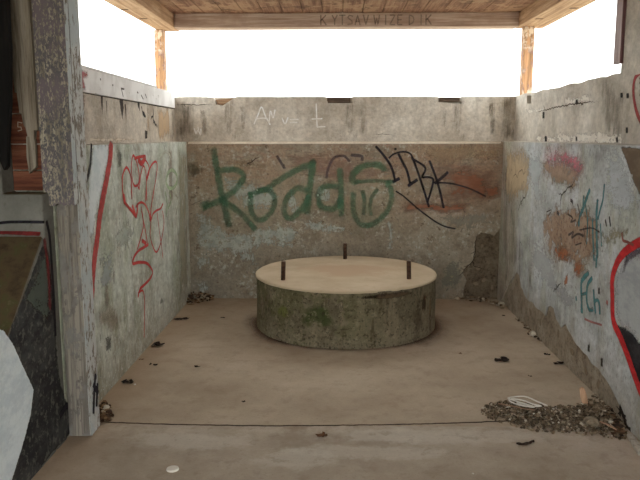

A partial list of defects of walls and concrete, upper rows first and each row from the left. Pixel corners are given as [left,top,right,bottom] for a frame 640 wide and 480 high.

crack [537,101,595,120]
spalling [463,229,624,423]